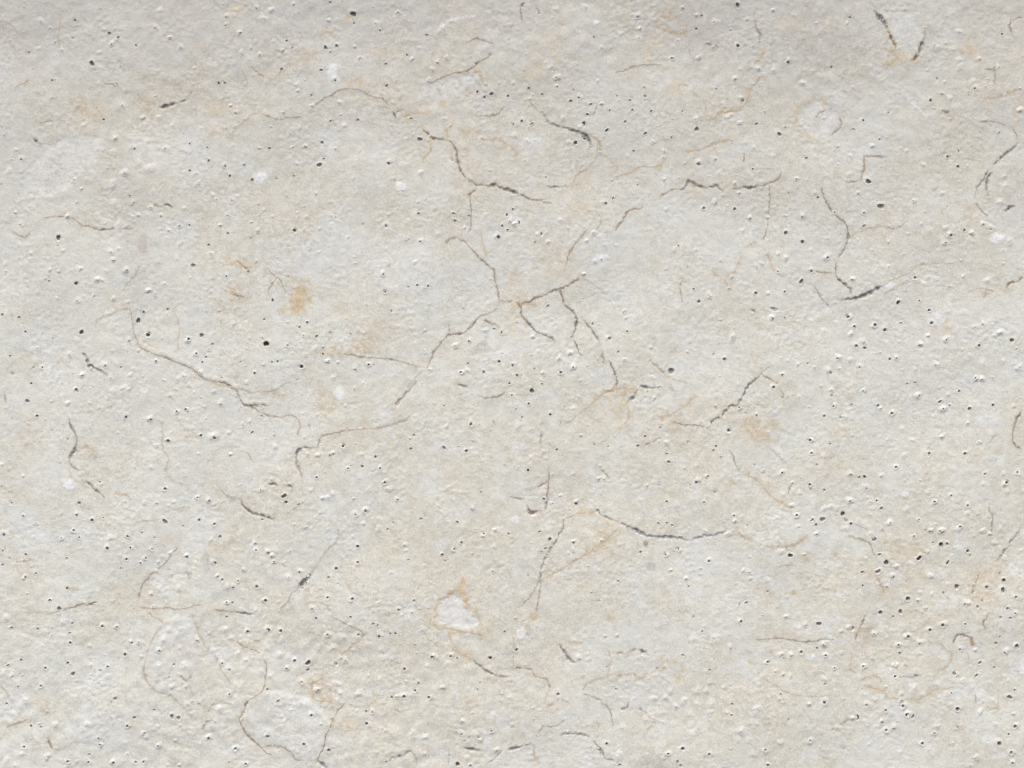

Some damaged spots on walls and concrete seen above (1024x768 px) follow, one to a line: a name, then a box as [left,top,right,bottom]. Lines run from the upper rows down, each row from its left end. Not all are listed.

crack [75,31,816,768]
crack [811,110,1024,312]